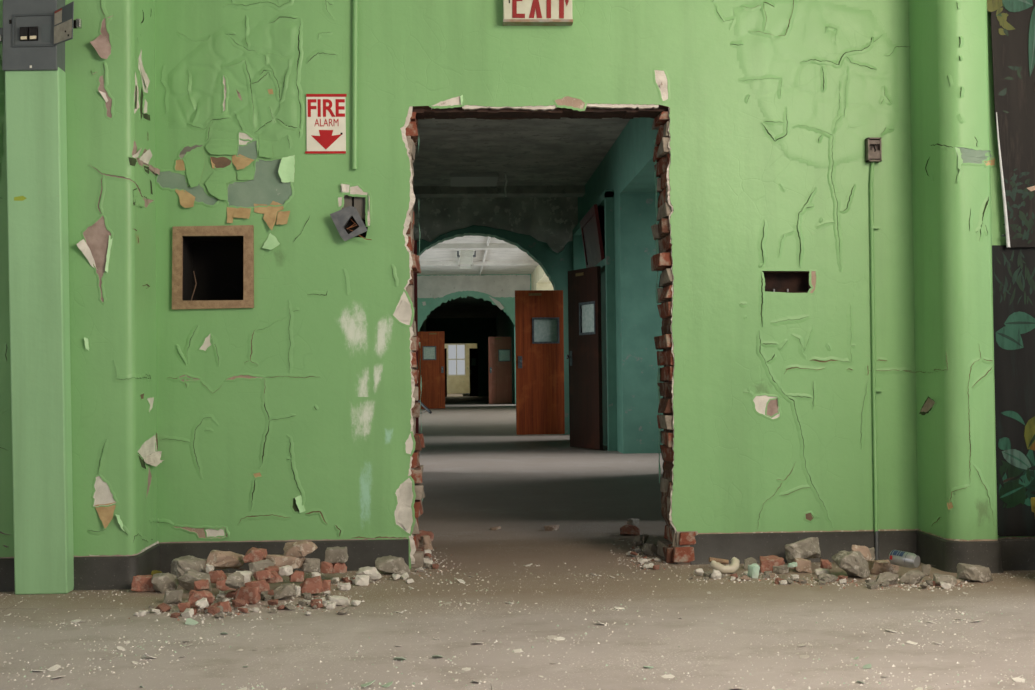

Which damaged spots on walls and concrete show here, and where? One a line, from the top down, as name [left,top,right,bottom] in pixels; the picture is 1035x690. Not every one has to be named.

crack [147,0,338,149]
crack [710,0,797,49]
peeling [77,214,114,305]
peeling [127,130,295,250]
peeling [391,275,530,327]
peeling [413,197,578,255]
crack [738,23,910,531]
peeling [136,432,163,499]
crack [236,394,344,538]
water stain [333,298,395,538]
flaking render [392,476,416,536]
crack [900,343,996,528]